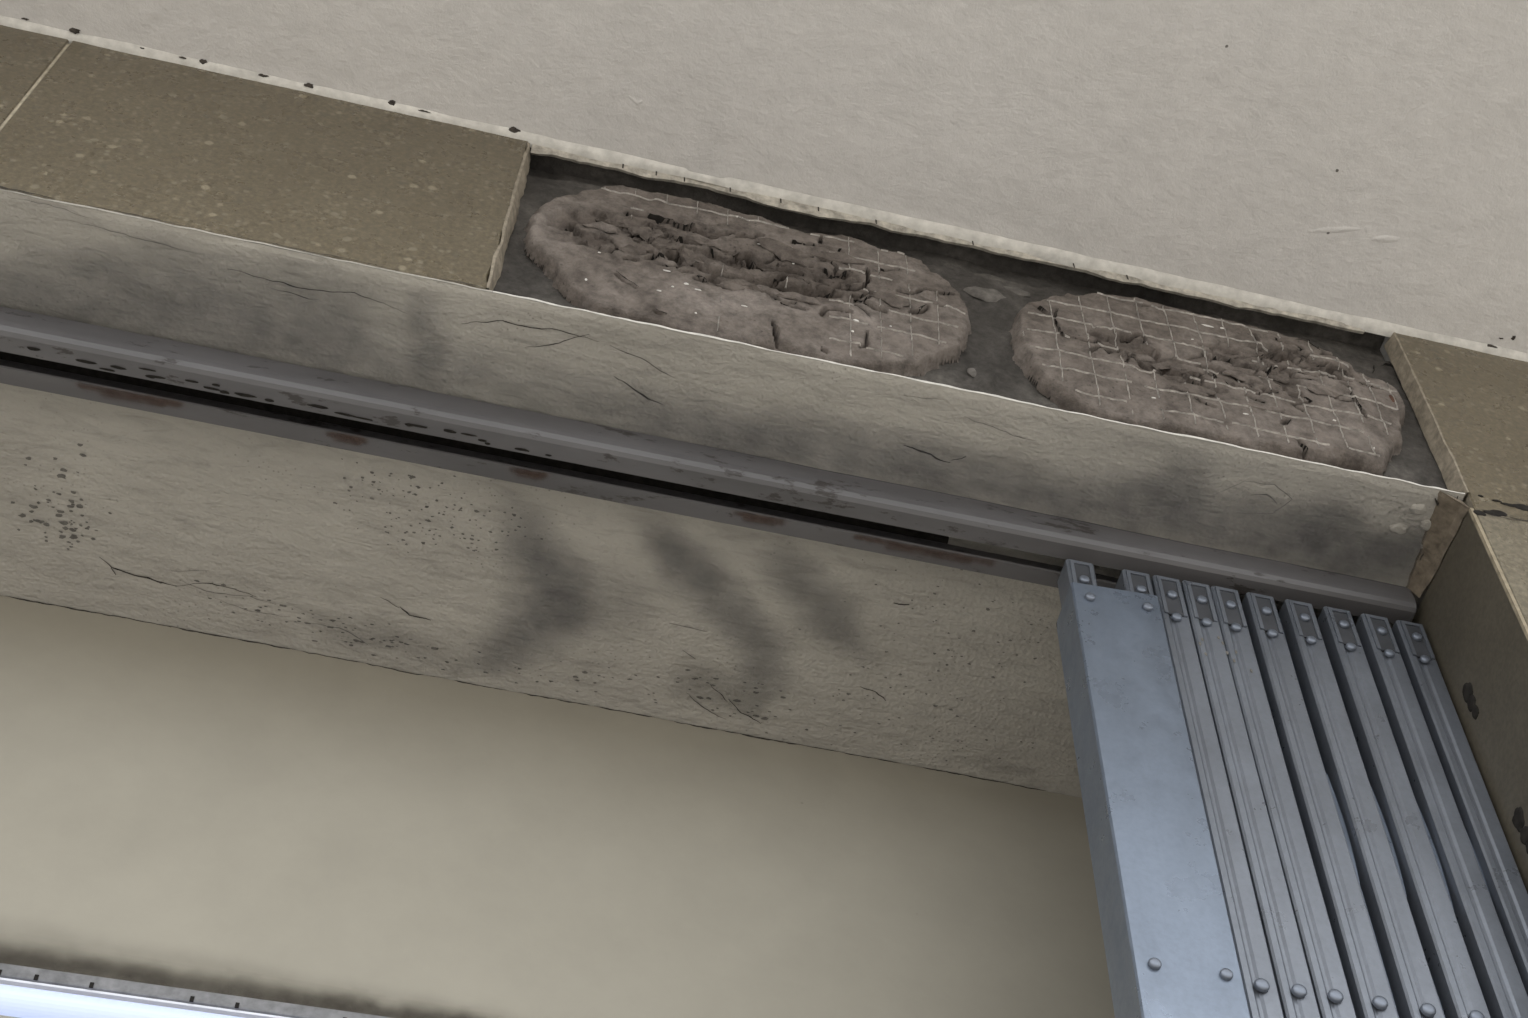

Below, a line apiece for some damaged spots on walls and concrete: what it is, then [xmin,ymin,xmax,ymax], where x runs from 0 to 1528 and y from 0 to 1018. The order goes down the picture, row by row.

peeling [486,126,1470,598]